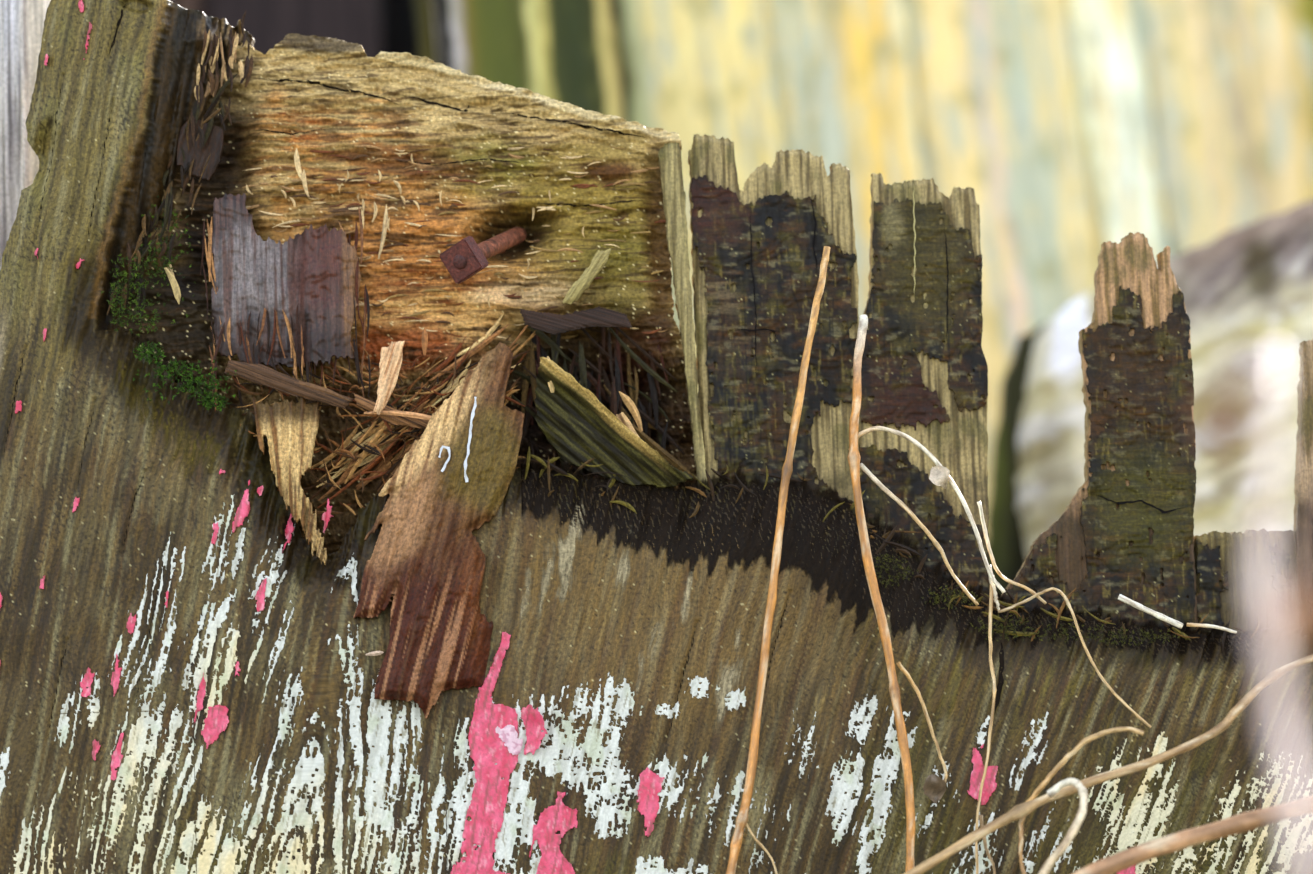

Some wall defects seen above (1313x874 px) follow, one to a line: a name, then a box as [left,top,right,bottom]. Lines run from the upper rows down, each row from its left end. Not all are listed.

peeling [9,480,791,874]
peeling [0,747,10,797]
peeling [784,694,918,874]
peeling [915,712,1049,874]
peeling [1023,731,1180,874]
peeling [1116,752,1292,874]